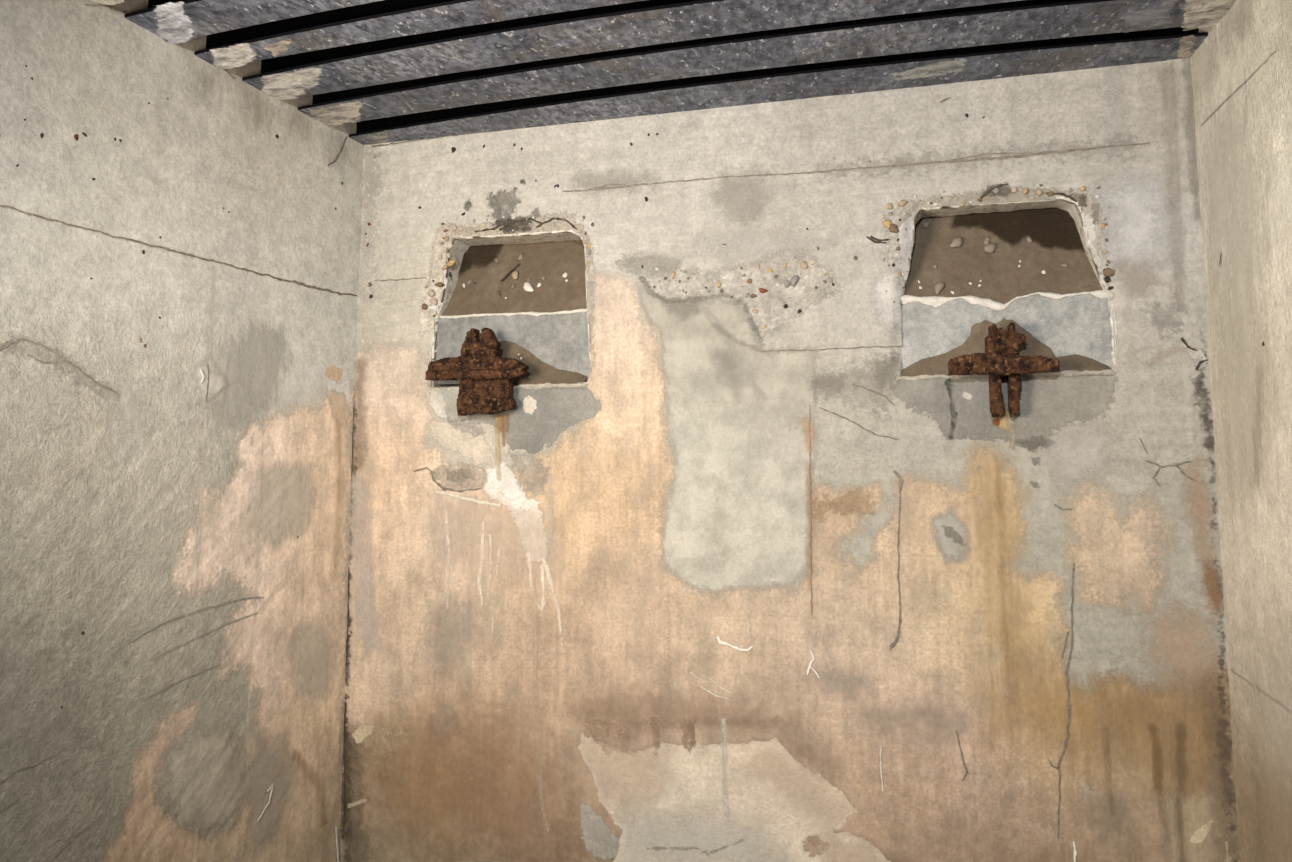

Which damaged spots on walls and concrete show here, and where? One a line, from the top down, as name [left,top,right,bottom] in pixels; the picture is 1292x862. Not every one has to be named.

crack [0,205,427,296]
spalling [417,180,596,350]
spalling [615,235,844,346]
crack [760,345,902,353]
spalling [870,184,1116,328]
leakage [1102,179,1177,294]
leakage [341,364,401,862]
leakage [469,521,501,634]
leakage [483,435,563,706]
crack [820,407,903,651]
crack [1048,563,1074,837]
peeling [578,719,891,862]